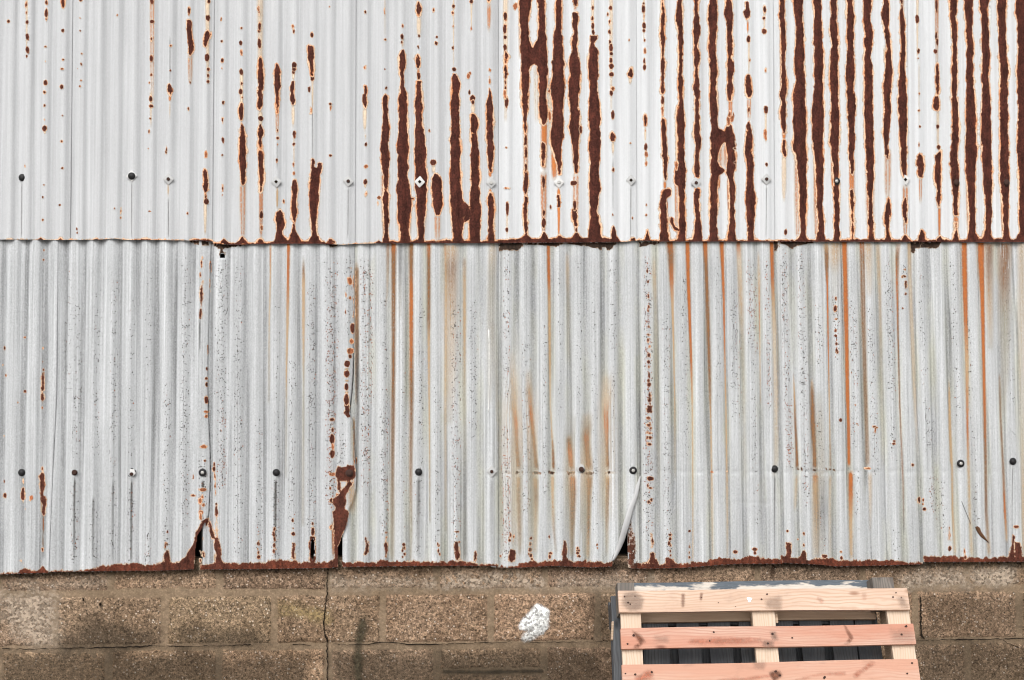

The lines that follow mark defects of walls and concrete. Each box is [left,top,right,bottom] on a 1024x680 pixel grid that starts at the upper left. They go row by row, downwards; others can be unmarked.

corrosion [0,267,613,574]
corrosion [105,0,1024,568]
crack [293,569,608,680]